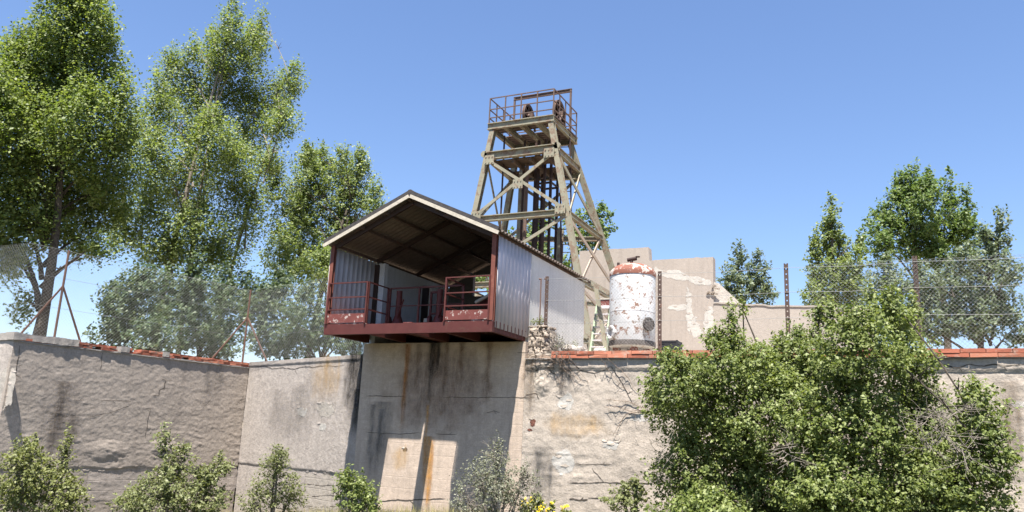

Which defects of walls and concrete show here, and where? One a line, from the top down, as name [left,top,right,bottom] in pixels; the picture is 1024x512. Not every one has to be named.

peeling [654,267,720,338]
spalling [0,366,18,410]